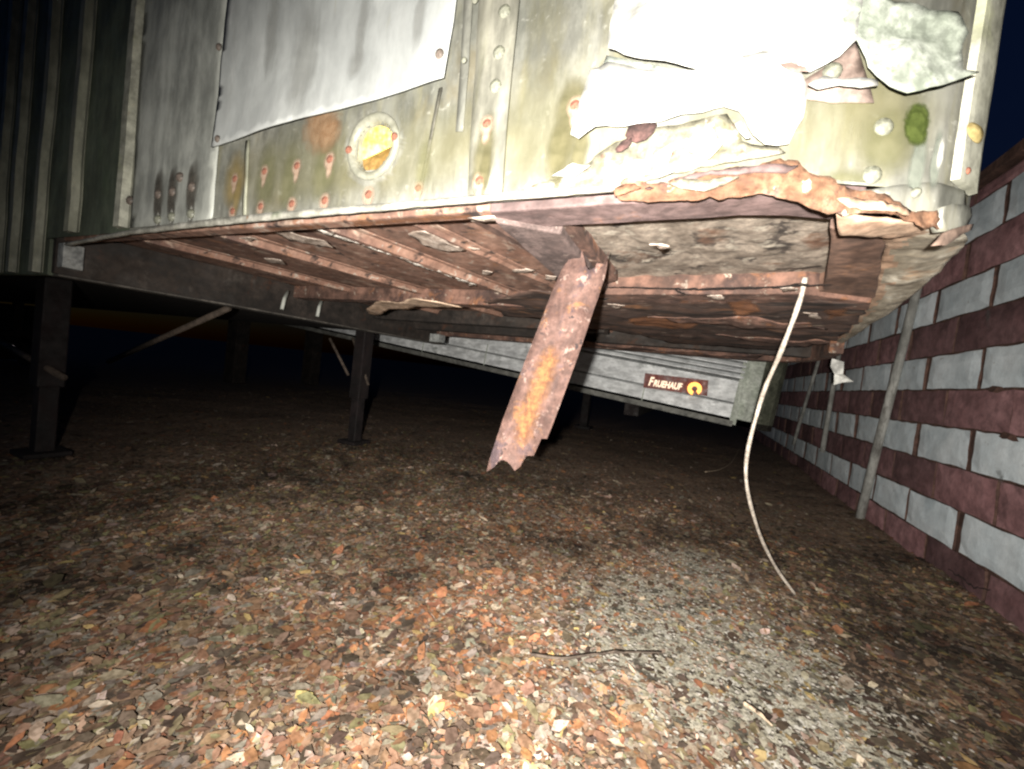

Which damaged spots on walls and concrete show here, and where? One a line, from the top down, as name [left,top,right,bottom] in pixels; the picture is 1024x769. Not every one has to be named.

rust [517,350,556,440]